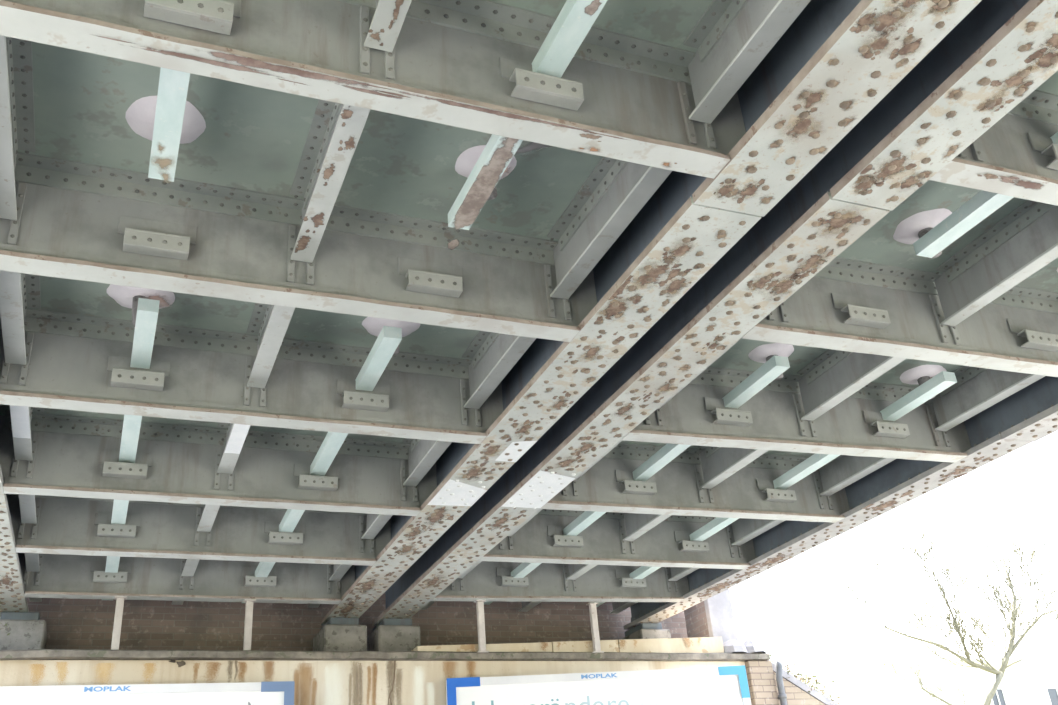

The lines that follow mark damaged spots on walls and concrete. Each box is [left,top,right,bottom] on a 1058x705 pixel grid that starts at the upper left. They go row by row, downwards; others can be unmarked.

corrosion [585,0,602,15]
corrosion [448,137,519,250]
corrosion [978,174,1044,189]
corrosion [616,356,705,424]
water stain [293,661,436,705]